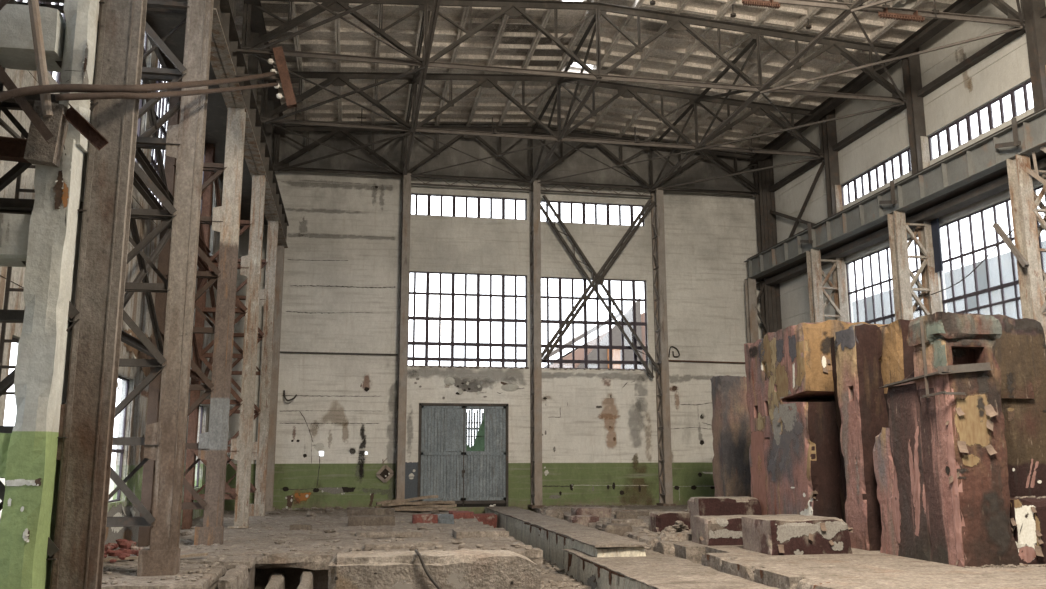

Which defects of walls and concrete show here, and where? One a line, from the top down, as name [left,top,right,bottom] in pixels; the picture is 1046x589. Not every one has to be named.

spalling [53,147,72,211]
peeling [442,378,487,399]
peeling [945,388,1015,565]
peeling [1010,499,1044,563]